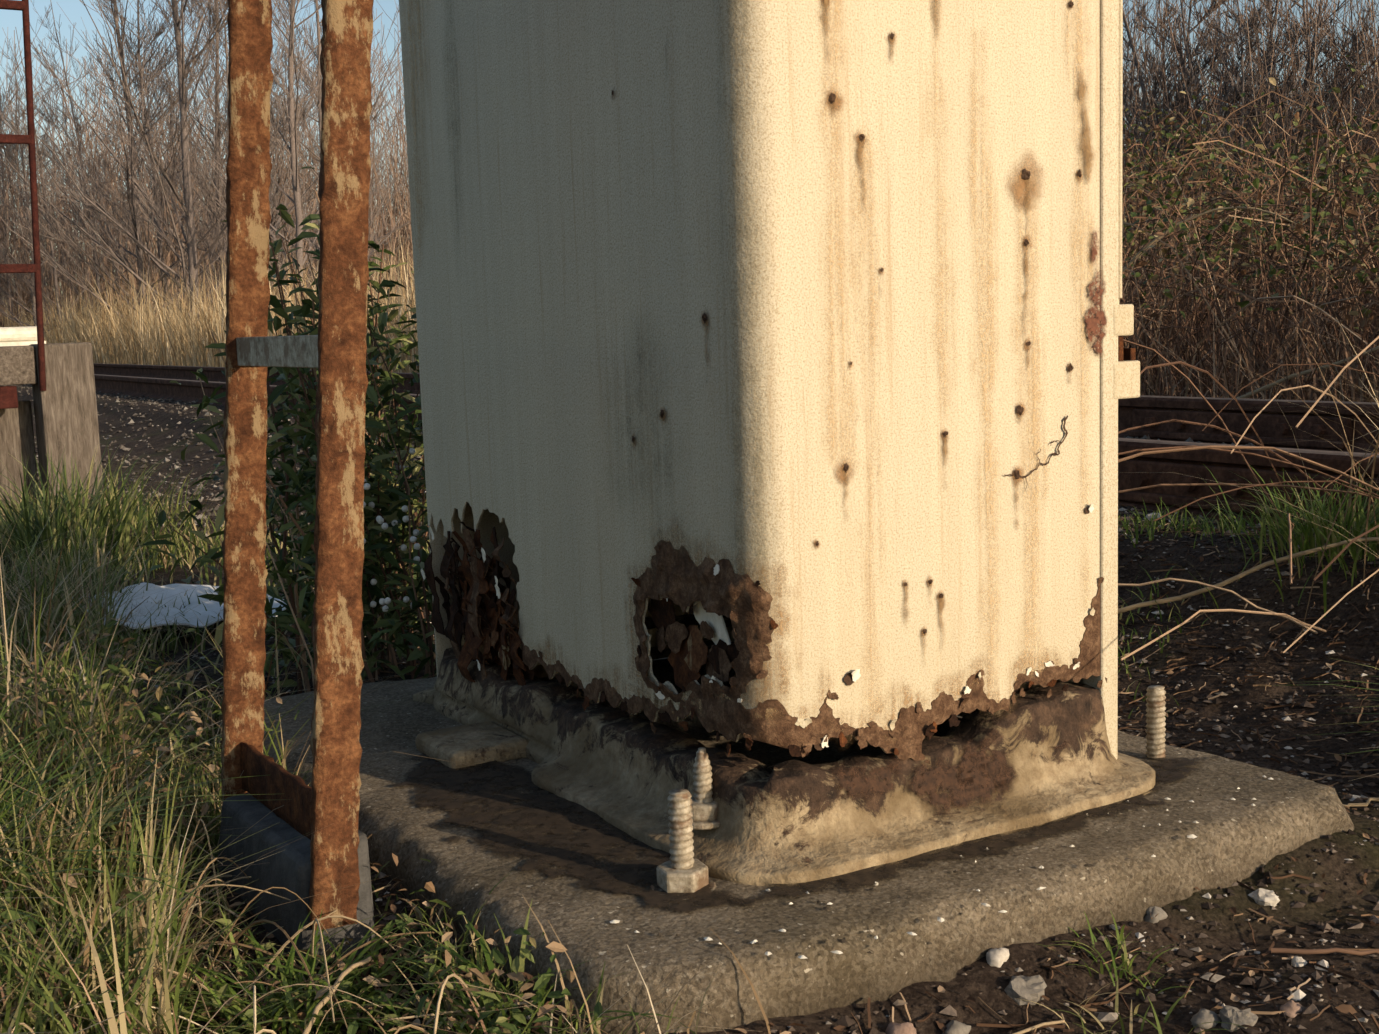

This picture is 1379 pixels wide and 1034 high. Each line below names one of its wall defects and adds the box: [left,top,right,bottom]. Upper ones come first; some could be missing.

water stain [392,754,1219,912]